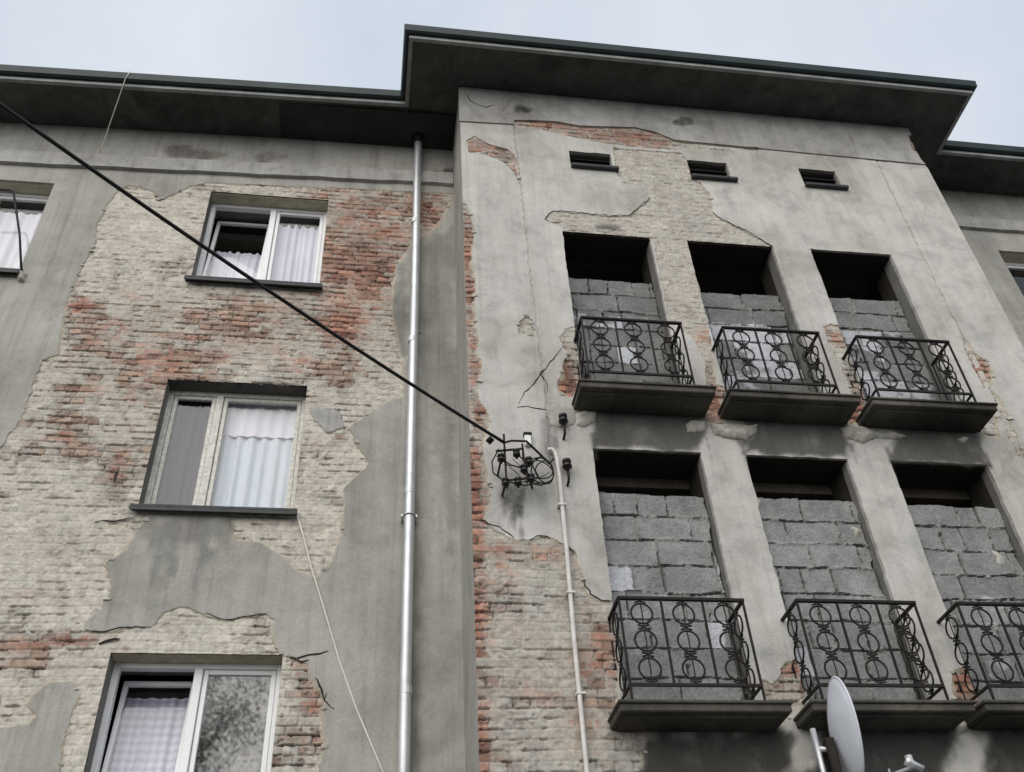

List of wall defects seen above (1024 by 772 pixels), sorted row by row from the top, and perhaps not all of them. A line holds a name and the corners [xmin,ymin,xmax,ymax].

spalling [466,136,521,182]
spalling [513,121,772,425]
crack [517,346,565,410]
spalling [823,323,866,426]
spalling [961,334,1024,459]
spalling [0,182,650,772]
crack [289,651,335,710]
spalling [949,667,978,707]